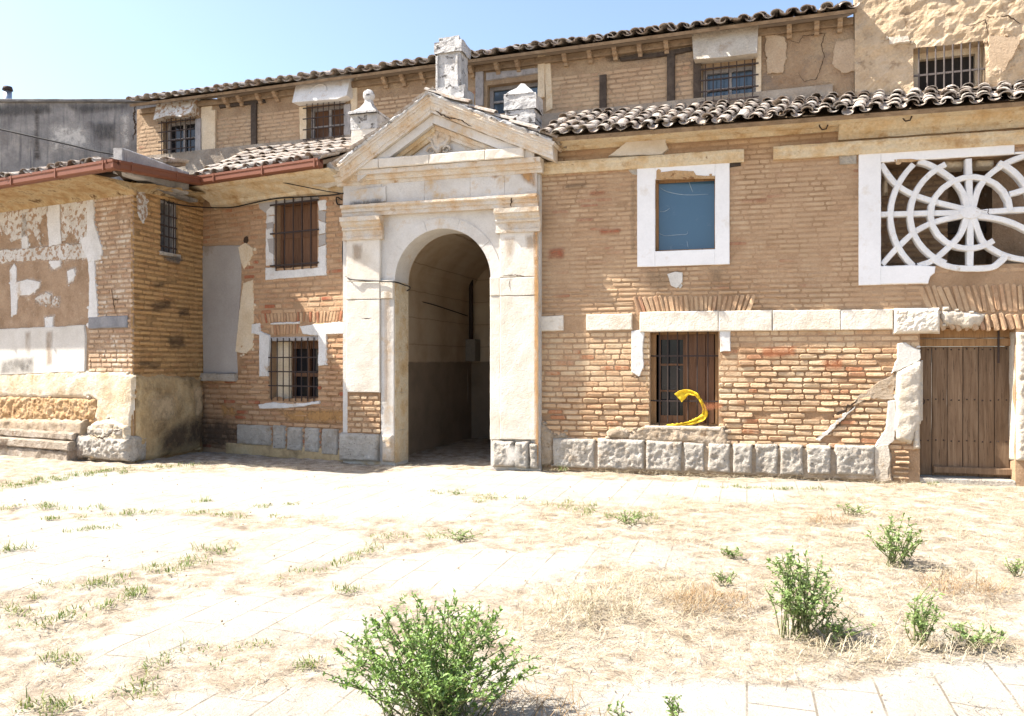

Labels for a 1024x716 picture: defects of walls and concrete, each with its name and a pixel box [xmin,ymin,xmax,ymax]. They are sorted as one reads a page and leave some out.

peeling [764,35,787,78]
peeling [832,36,862,73]
peeling [0,200,103,328]
leakage [152,387,237,448]